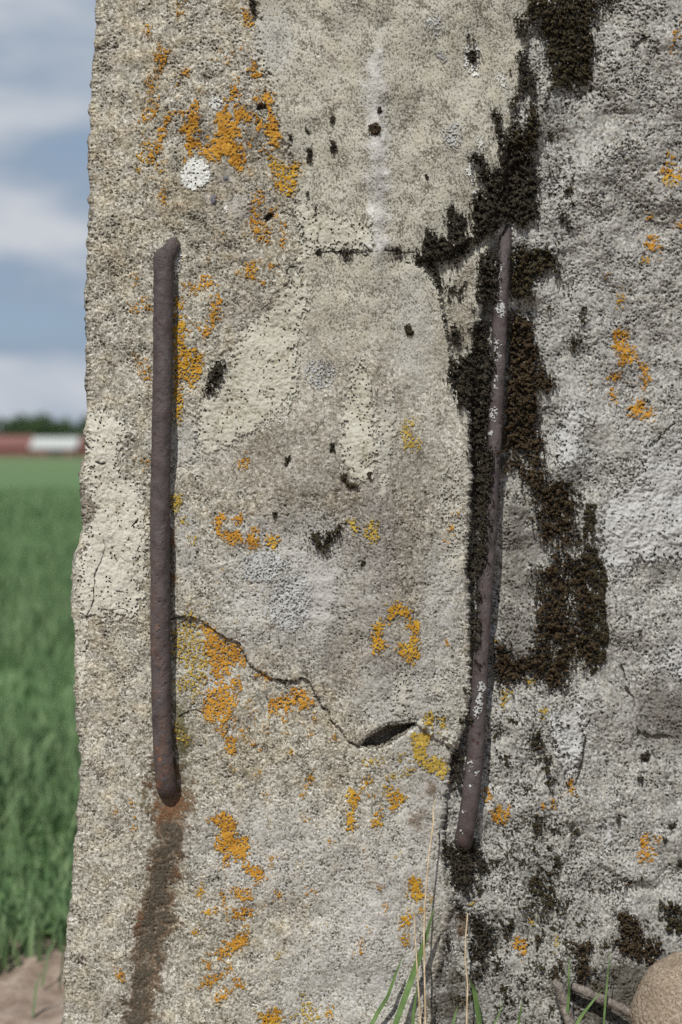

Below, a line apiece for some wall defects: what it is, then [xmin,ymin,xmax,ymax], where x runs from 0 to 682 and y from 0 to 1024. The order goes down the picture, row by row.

rust [170,528,178,602]
crack [171,616,362,746]
rust [120,756,199,1024]
damp [573,964,649,1024]